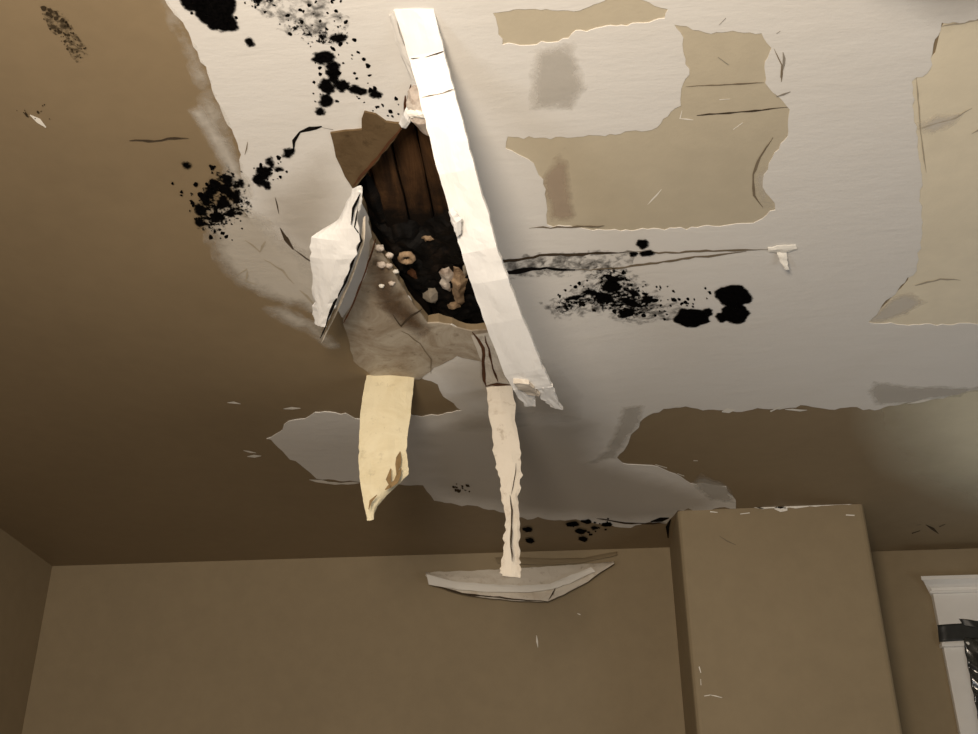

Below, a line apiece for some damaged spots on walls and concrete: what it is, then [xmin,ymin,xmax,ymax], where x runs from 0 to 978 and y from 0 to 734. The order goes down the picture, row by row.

leakage [180,0,399,118]
peeling [494,0,668,45]
leakage [171,148,295,241]
peeling [343,237,488,380]
leakage [629,240,655,257]
peeling [506,25,790,231]
leakage [547,268,753,328]
peeling [869,19,978,325]